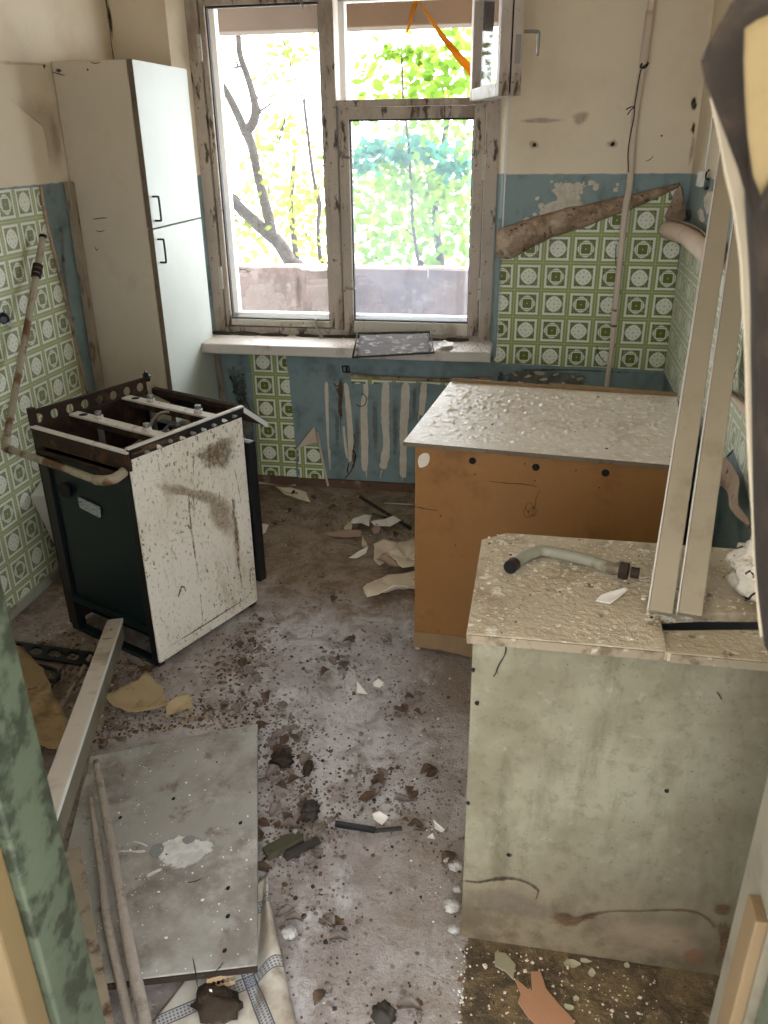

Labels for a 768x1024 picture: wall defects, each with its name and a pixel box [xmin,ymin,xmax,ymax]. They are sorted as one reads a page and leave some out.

peeling [523,179,599,220]
peeling [343,383,427,481]